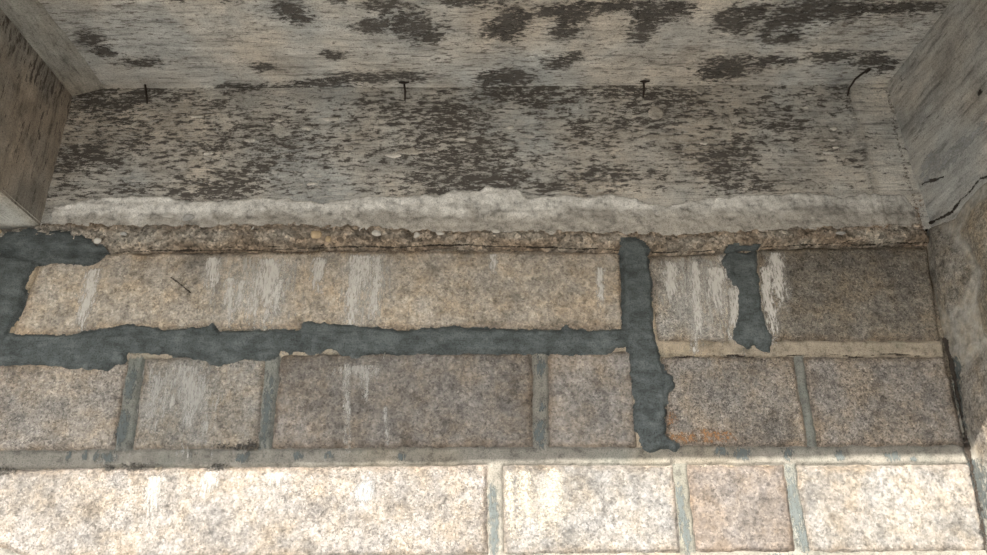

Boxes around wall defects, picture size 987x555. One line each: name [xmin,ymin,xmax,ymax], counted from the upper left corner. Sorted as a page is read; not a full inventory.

water stain [66,22,165,70]
water stain [271,0,316,26]
water stain [200,48,452,89]
water stain [327,0,947,88]
crack [762,176,987,248]
crack [652,247,720,255]
water stain [76,268,101,331]
water stain [197,256,328,330]
water stain [338,253,390,328]
water stain [596,267,606,305]
water stain [651,257,739,383]